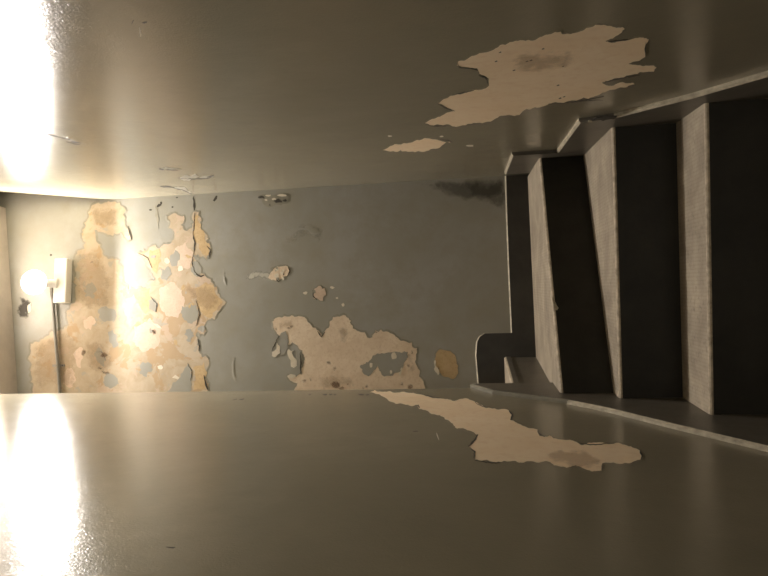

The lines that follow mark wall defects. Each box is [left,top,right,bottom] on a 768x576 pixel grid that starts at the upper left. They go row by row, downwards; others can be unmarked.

peeling [382,23,658,153]
spalling [18,298,31,317]
peeling [26,167,227,394]
crack [192,196,204,277]
peeling [249,264,291,283]
spalling [258,194,290,208]
peeling [271,285,643,473]